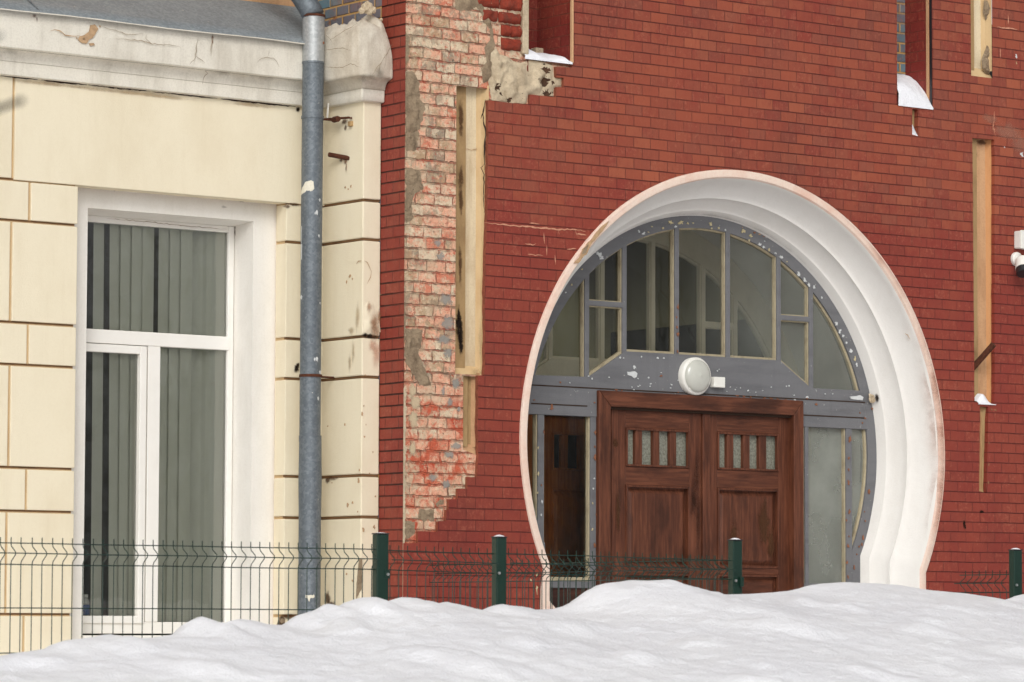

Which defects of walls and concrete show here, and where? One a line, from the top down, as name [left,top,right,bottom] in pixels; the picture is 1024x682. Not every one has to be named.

peeling [51,24,101,46]
crack [5,26,296,107]
flaking render [981,46,990,75]
crack [468,102,586,264]
spalling [403,0,570,543]